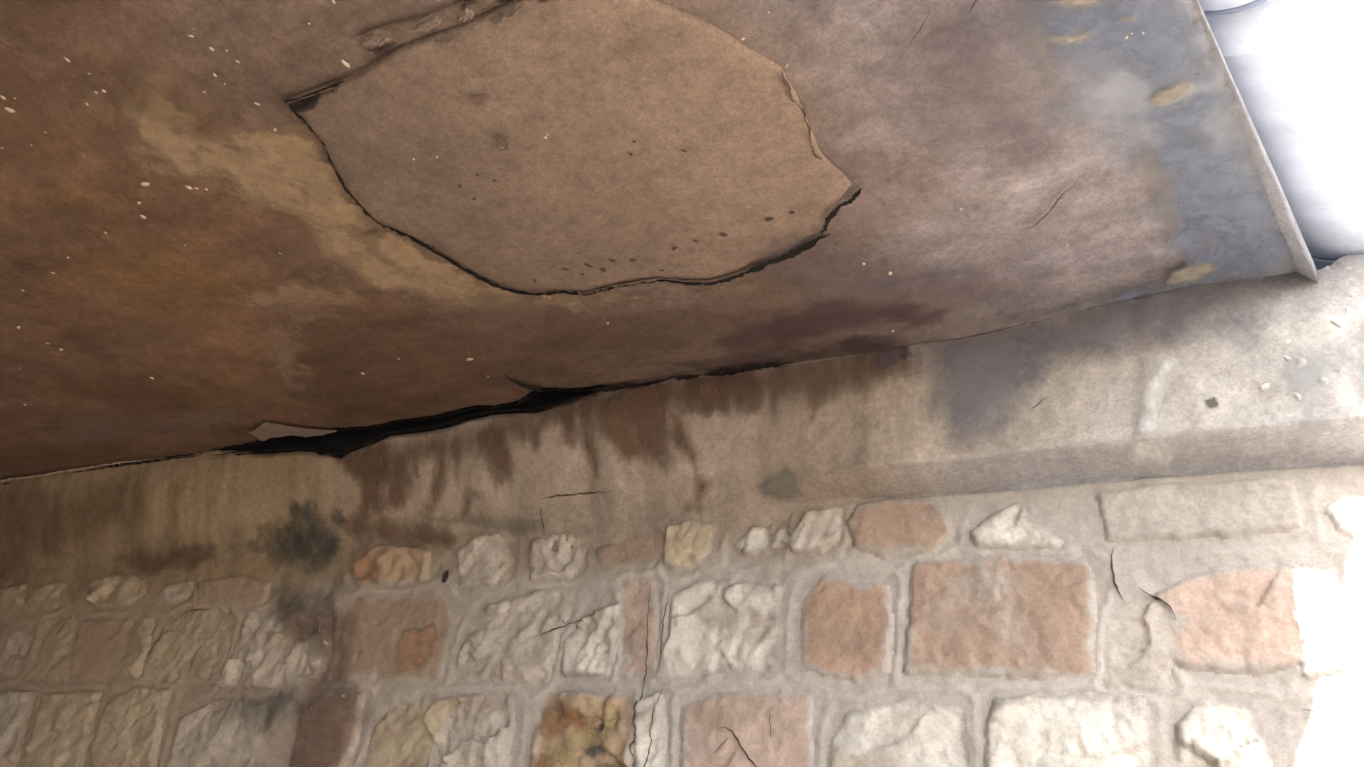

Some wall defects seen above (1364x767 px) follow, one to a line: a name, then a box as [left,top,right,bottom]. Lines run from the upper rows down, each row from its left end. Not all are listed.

water stain [940,269,1326,435]
peeling [249,422,337,441]
water stain [275,346,906,559]
water stain [1131,360,1174,465]
water stain [122,546,211,572]
crack [536,603,611,636]
crack [1110,550,1176,620]
crack [629,585,671,767]